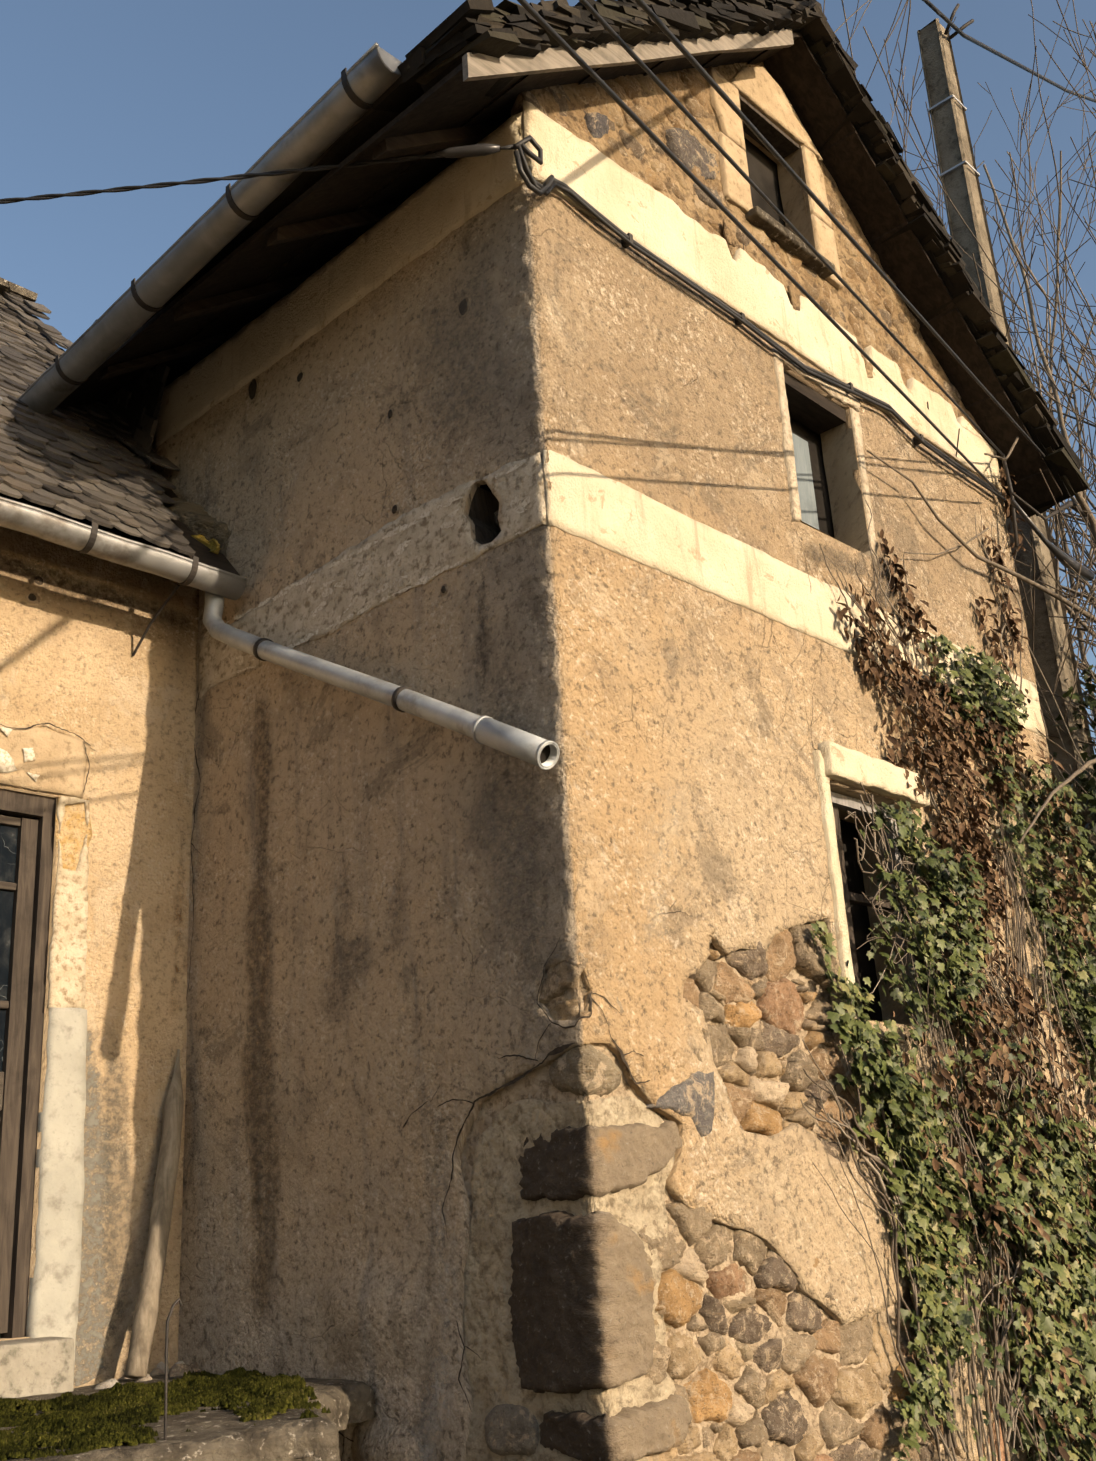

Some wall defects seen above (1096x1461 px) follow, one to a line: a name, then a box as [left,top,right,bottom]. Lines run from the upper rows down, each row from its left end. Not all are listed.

peeling [0,726,40,782]
peeling [198,631,266,699]
peeling [226,452,547,649]
leakage [242,702,279,1314]
crack [403,939,650,1239]
spalling [538,945,588,1021]
spalling [683,923,895,1162]
spalling [639,1201,1009,1461]